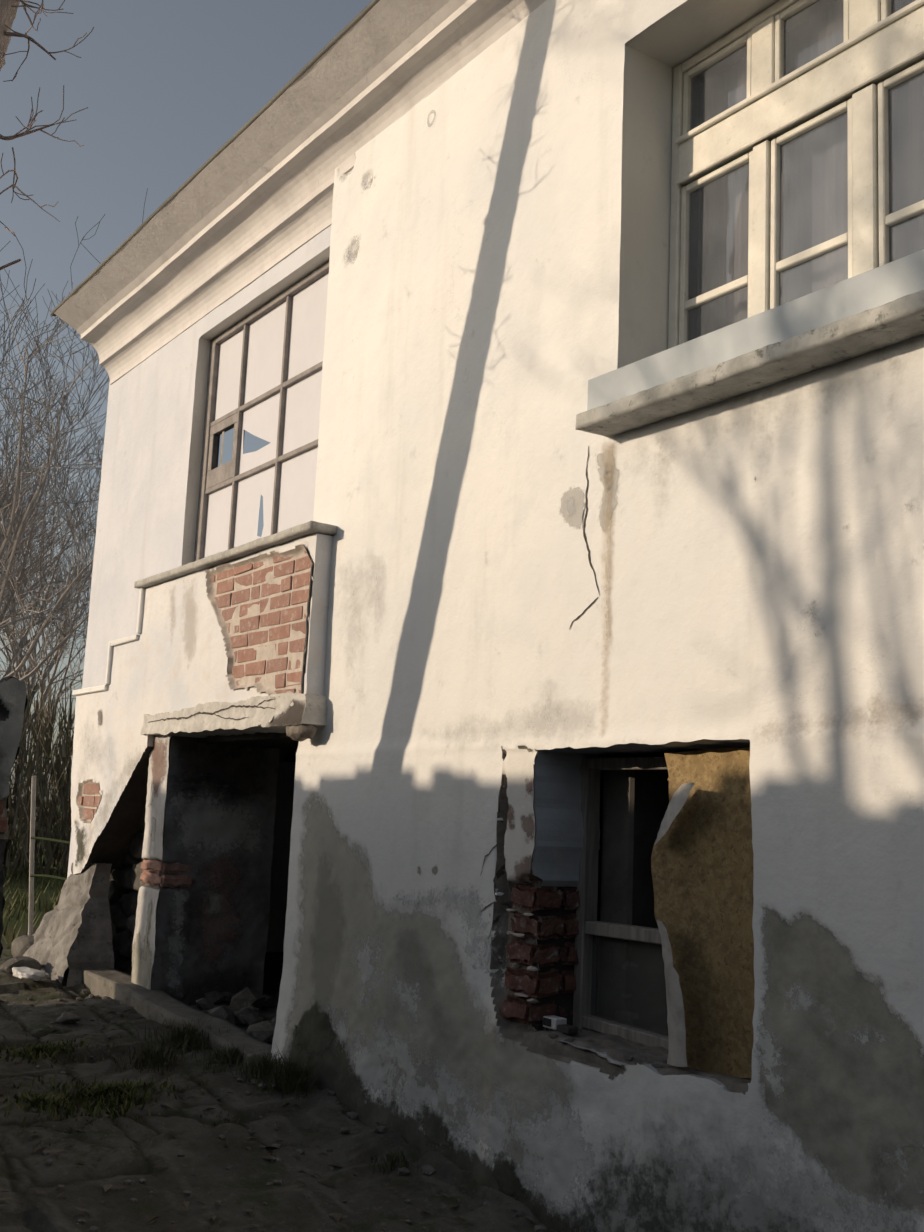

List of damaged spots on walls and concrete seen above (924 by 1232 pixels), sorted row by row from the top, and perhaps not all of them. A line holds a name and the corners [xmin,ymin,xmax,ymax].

crack [569,446,600,629]
flaking render [205,542,314,726]
crack [148,698,276,723]
flaking render [76,778,115,831]
peeling [147,741,166,841]
flaking render [140,858,194,889]
peeling [495,749,541,896]
water stain [284,793,573,1127]
water stain [572,908,924,1232]